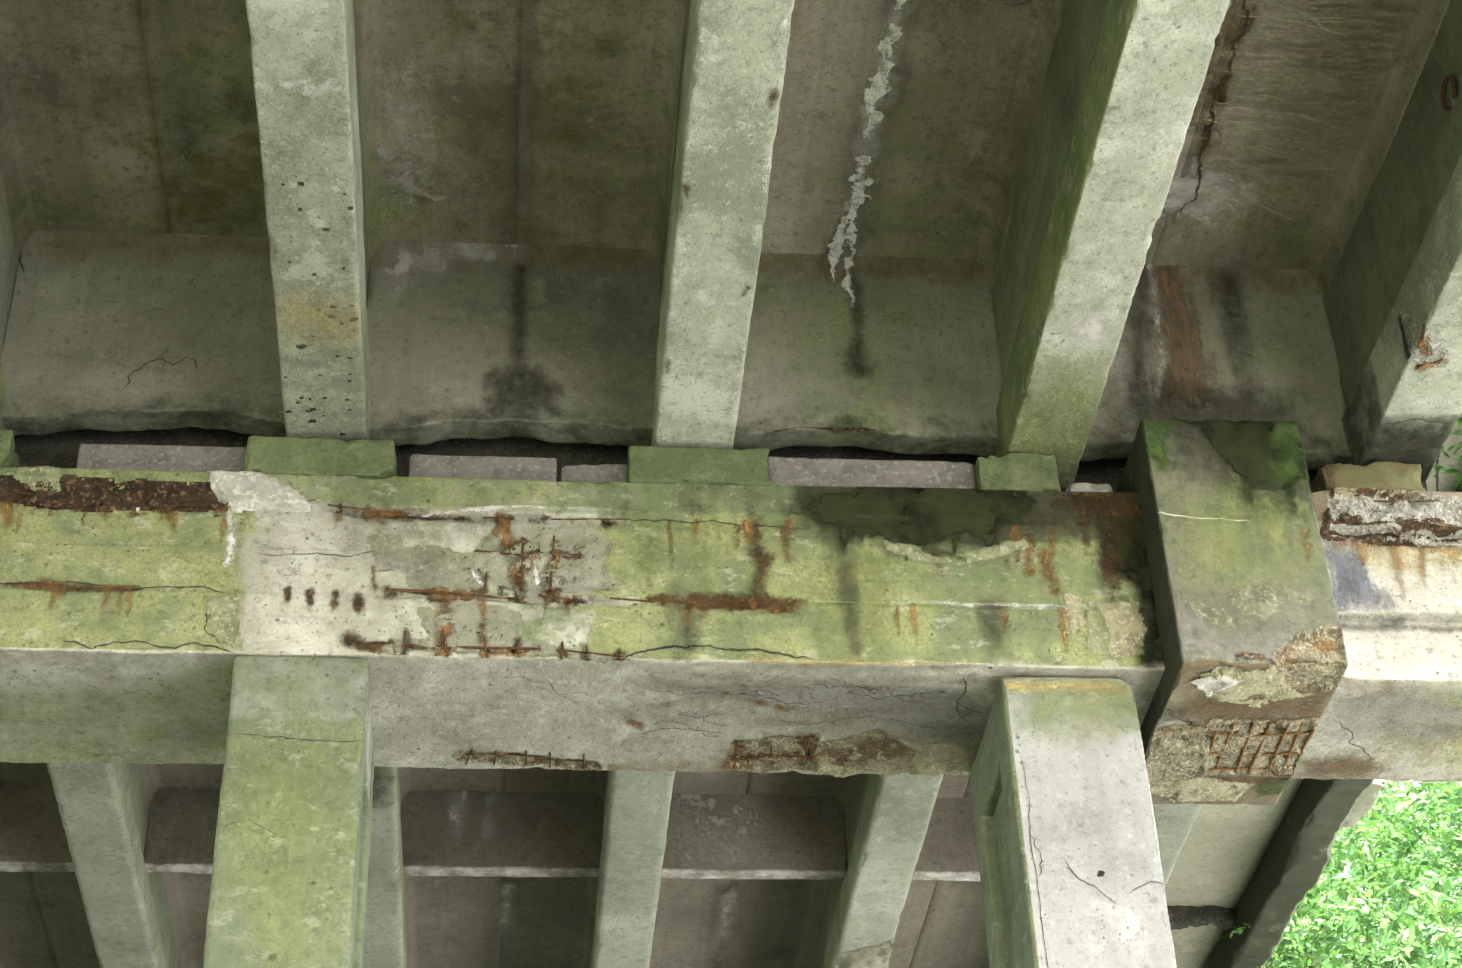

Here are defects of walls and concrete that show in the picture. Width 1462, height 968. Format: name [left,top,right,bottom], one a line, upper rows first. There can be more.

crack [1174,0,1258,219]
leakage [827,0,907,324]
leakage [493,371,553,412]
spalling [1320,487,1462,549]
rust [5,578,140,613]
spalling [0,466,665,661]
rust [646,515,806,624]
peeling [881,538,1030,566]
rust [1332,539,1462,582]
spalling [1146,625,1347,803]
spalling [725,723,974,778]